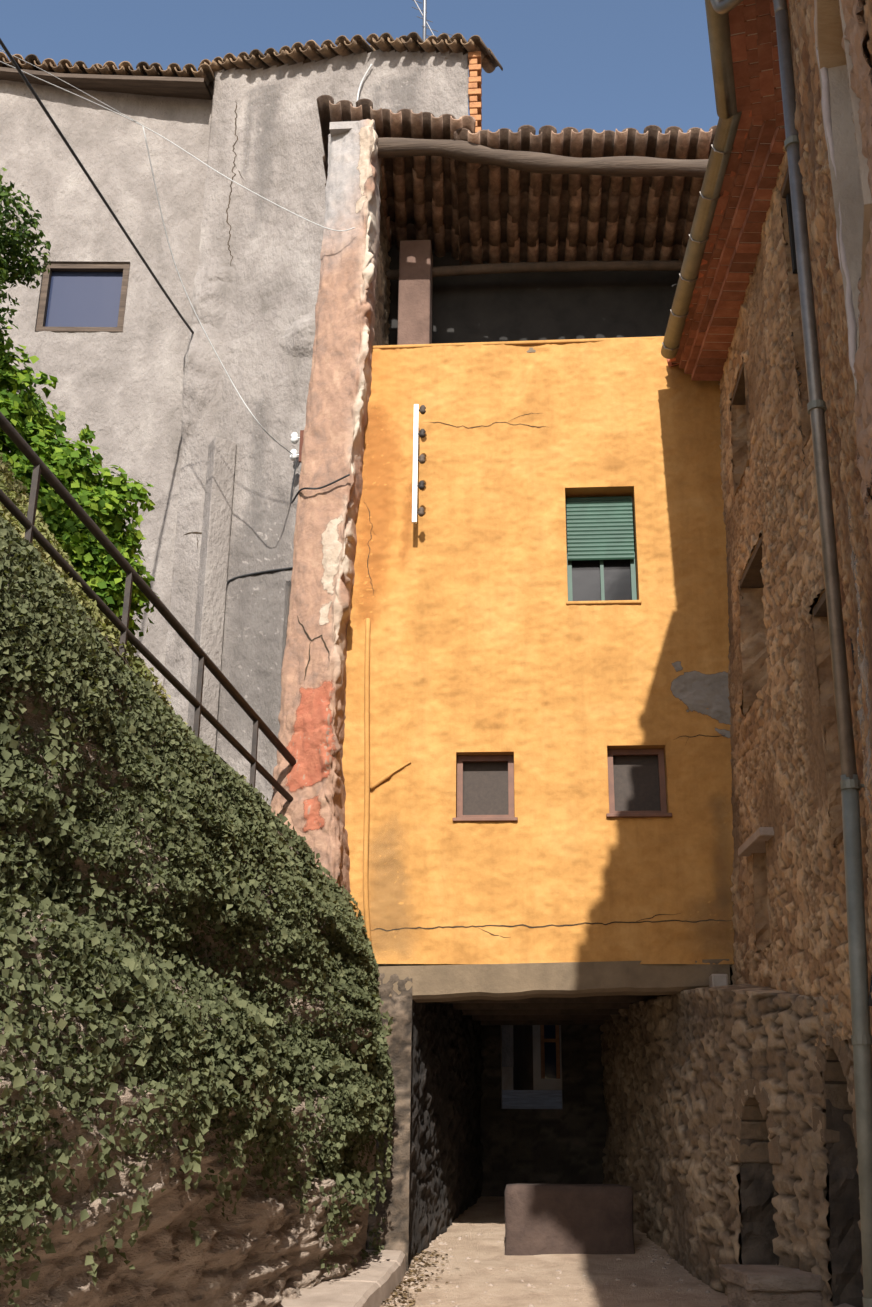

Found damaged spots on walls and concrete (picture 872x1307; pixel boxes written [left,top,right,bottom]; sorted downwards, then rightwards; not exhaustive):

crack [226,101,244,266]
flaking render [286,680,336,832]
crack [297,616,330,680]
flaking render [671,661,731,738]